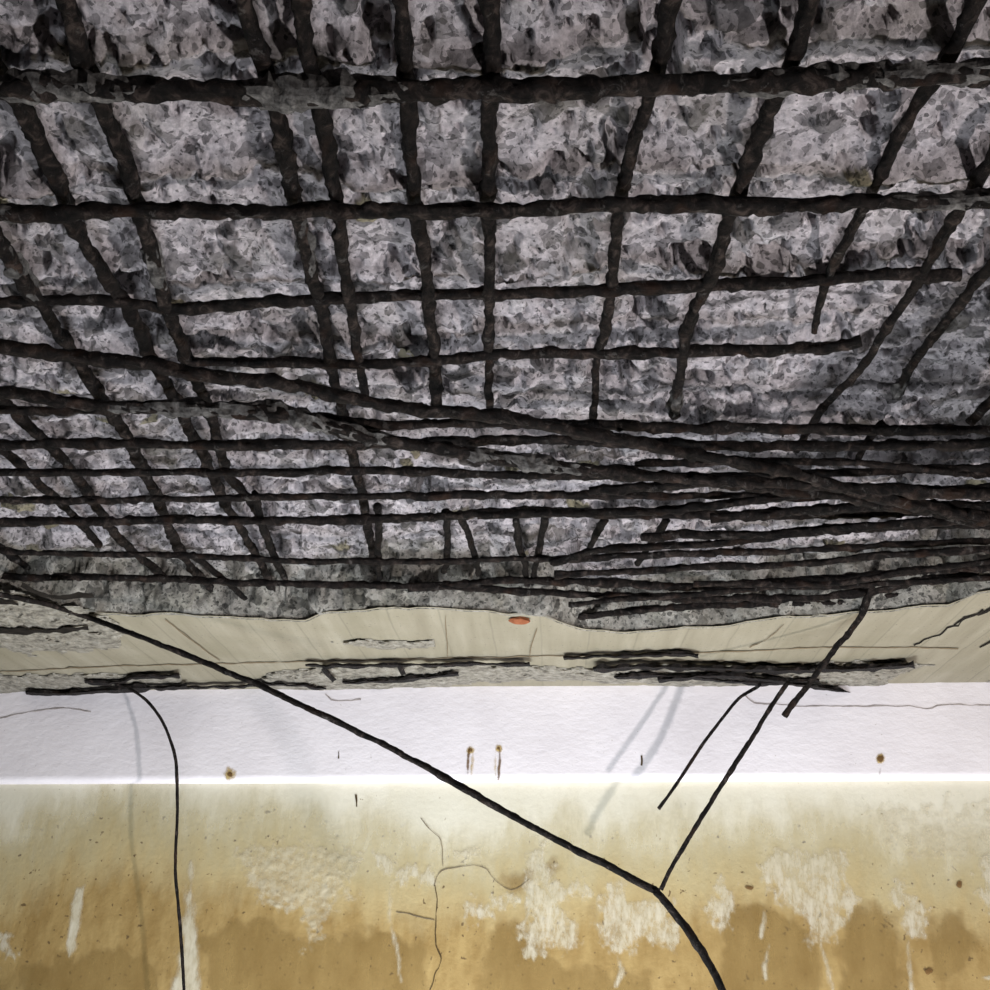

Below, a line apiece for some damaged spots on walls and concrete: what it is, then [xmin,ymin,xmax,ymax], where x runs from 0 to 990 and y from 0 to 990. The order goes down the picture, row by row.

spalling [0,0,990,530]
rust [508,616,530,625]
spalling [0,474,990,990]
crack [397,818,529,990]
leakage [0,798,990,990]